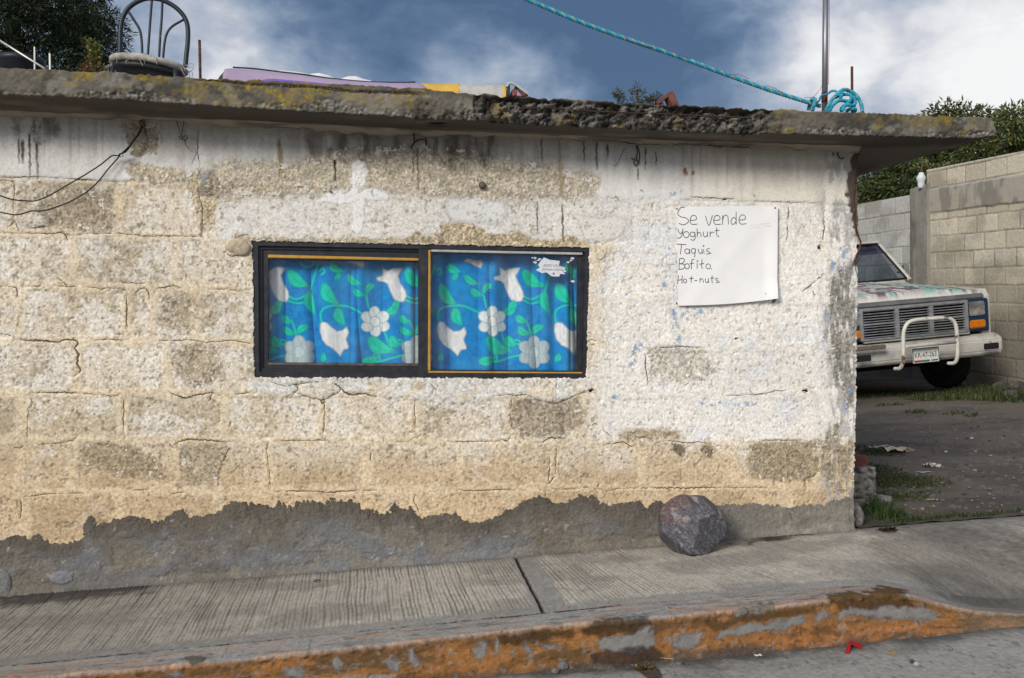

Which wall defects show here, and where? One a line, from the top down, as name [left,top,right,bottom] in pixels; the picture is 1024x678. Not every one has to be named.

damp [18,134,38,168]
crack [0,279,177,449]
crack [169,381,377,493]
peeling [716,585,937,639]
peeling [598,626,655,653]
peeling [672,632,704,649]